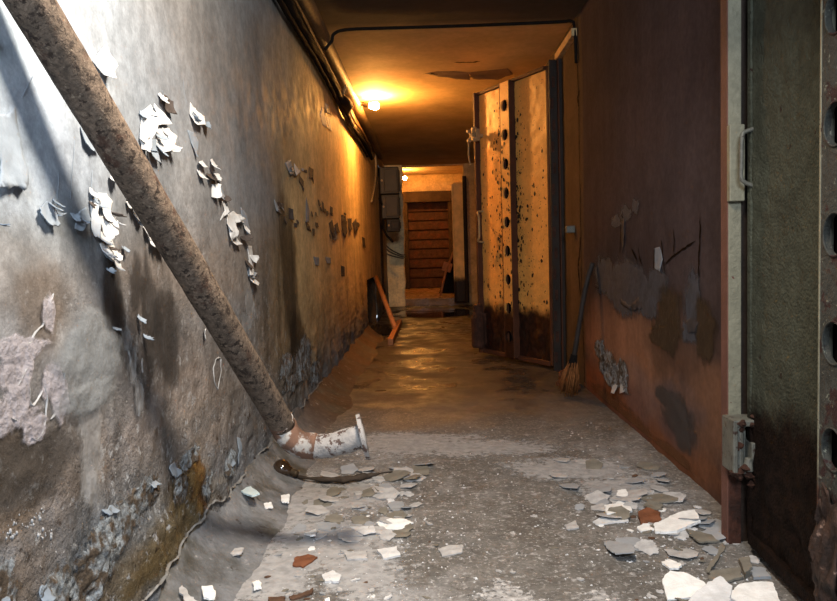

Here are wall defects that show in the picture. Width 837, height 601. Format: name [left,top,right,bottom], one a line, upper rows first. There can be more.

peeling [93,45,118,79]
peeling [0,108,29,191]
peeling [39,187,155,274]
peeling [139,93,260,285]
peeling [274,160,366,248]
flaking render [594,198,668,320]
flaking render [169,443,200,504]
flaking render [201,469,213,501]
flaking render [0,554,22,601]
flaking render [37,472,162,601]